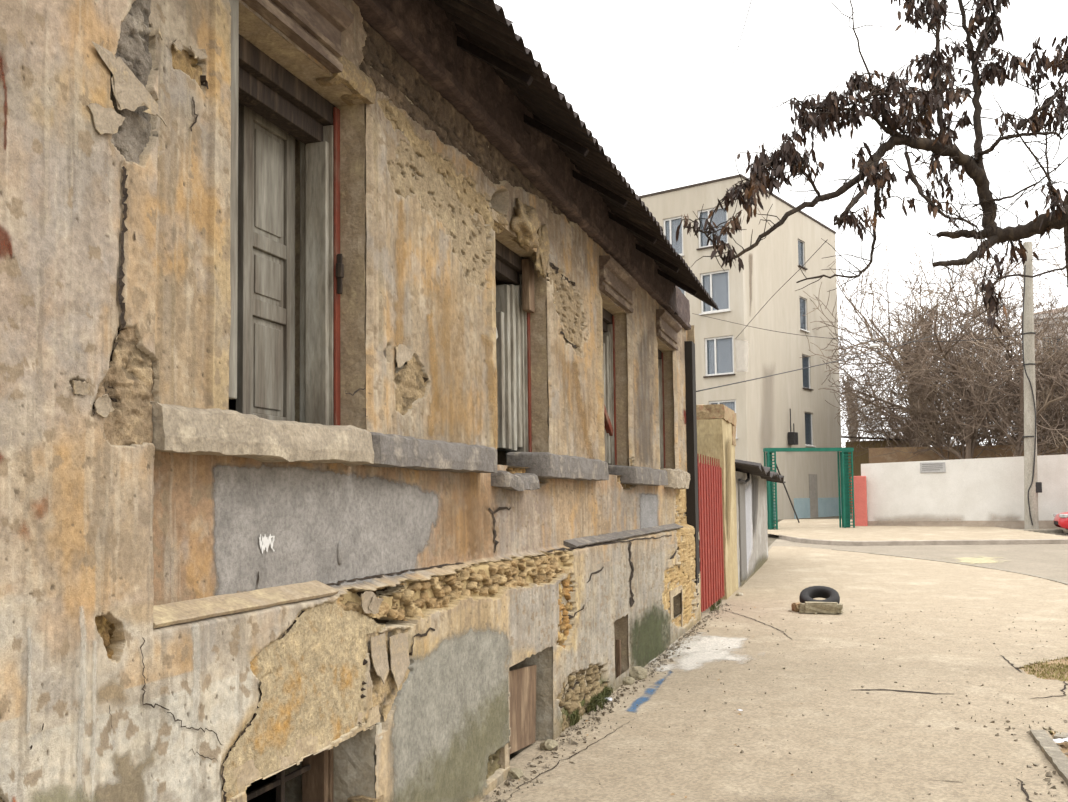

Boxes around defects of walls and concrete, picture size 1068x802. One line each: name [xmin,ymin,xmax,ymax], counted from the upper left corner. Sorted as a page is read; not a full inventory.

flaking render [87,0,208,164]
rust [0,226,12,258]
crack [92,166,136,416]
flaking render [377,99,494,290]
flaking render [69,327,159,446]
flaking render [95,616,115,659]
crack [140,637,262,802]
crack [280,610,305,639]
flaking render [223,551,573,802]
flaking render [556,664,608,732]
crack [548,535,679,625]
flaking render [662,489,697,628]